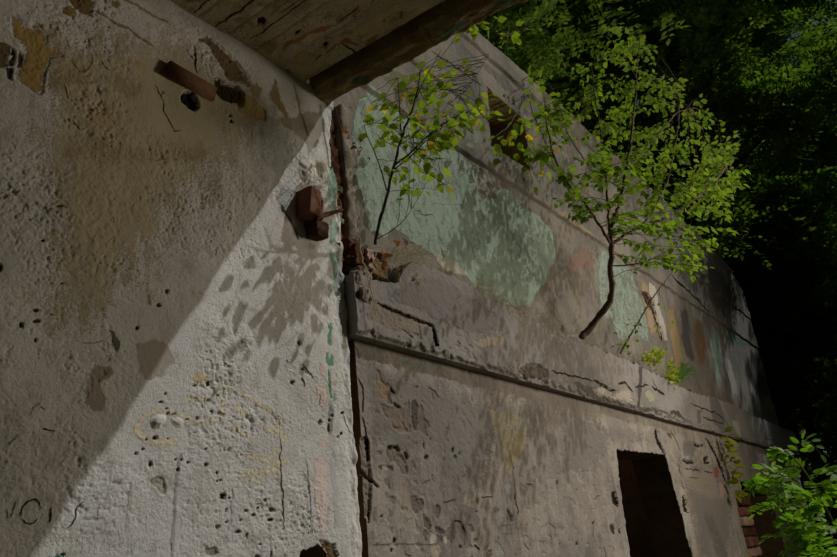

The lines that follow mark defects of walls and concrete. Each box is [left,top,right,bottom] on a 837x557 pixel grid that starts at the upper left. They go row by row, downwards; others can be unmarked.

peeling [0,17,62,93]
peeling [198,37,267,123]
crack [215,0,254,28]
crack [250,0,307,40]
crack [379,304,461,346]
crack [344,344,378,523]
crack [443,447,555,552]